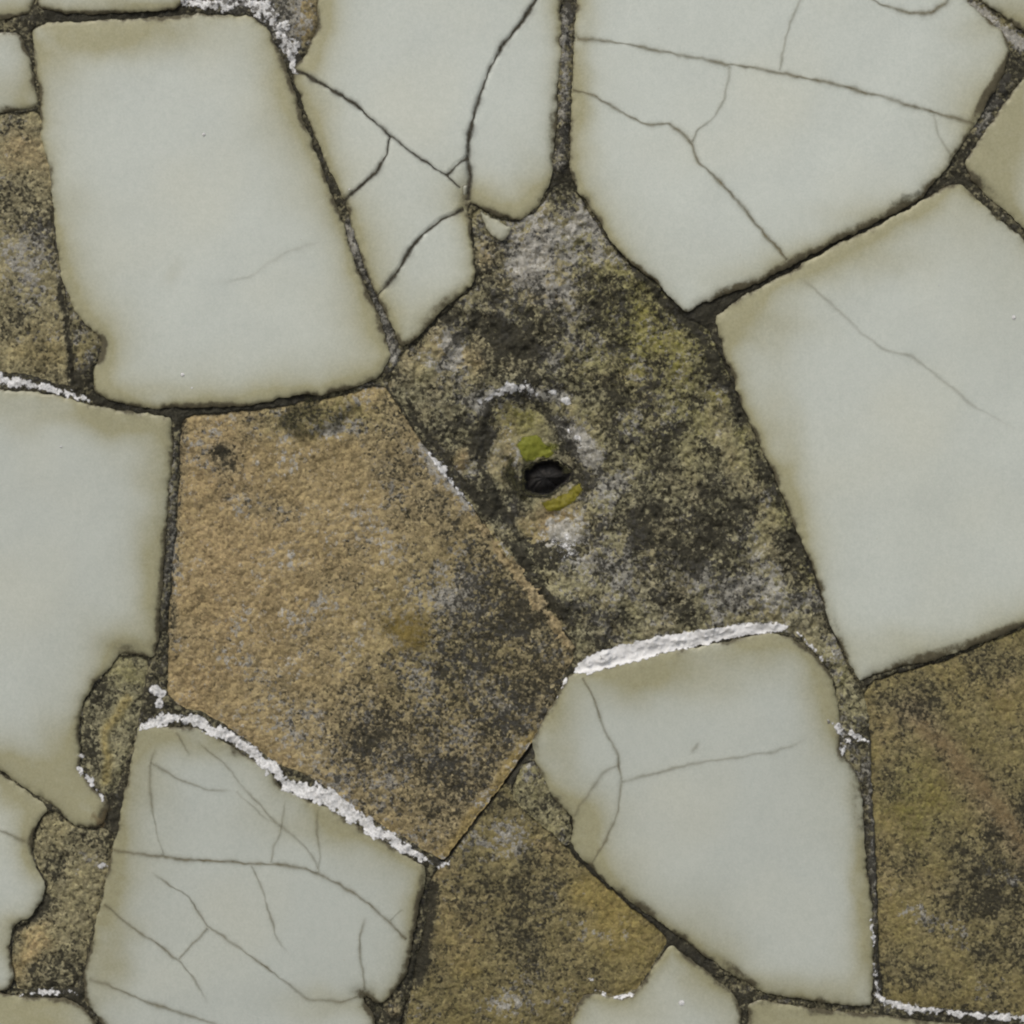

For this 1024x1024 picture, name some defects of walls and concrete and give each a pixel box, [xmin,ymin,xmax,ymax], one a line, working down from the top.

water stain [181,0,301,74]
crack [710,60,876,95]
crack [296,0,537,297]
crack [572,89,787,260]
peeling [480,211,511,241]
efflorescence [477,380,571,405]
efflorescence [556,622,823,699]
spalling [80,655,147,795]
water stain [139,685,450,869]
spalling [513,762,572,845]
spalling [12,811,114,990]
crack [143,854,407,940]